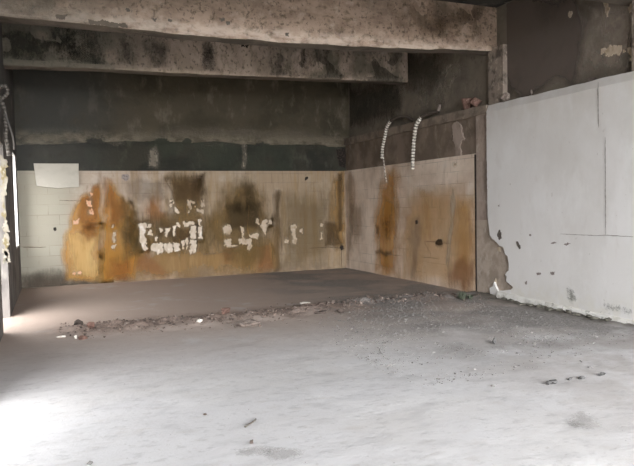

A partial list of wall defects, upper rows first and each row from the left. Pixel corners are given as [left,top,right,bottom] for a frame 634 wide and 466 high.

leakage [2,27,104,65]
peeling [583,3,632,67]
leakage [149,149,158,169]
rust [65,183,136,280]
peeling [138,200,205,255]
leakage [121,175,280,278]
peeling [223,218,272,251]
rust [376,171,397,269]
flaking render [476,220,513,293]